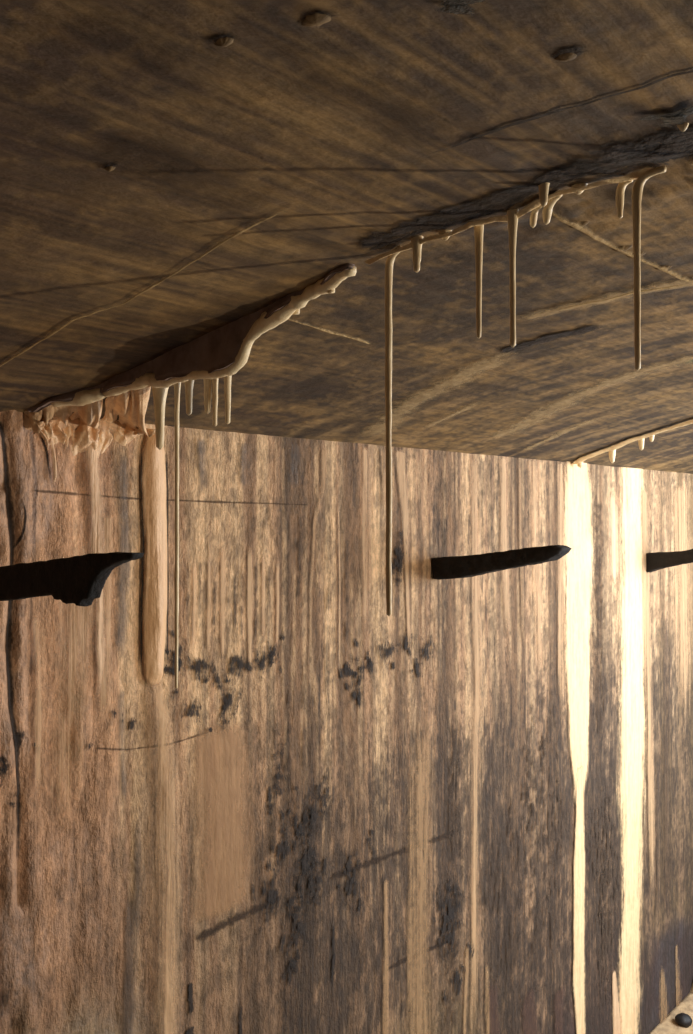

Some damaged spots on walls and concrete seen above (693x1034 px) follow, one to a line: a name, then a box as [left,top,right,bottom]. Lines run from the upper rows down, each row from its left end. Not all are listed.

crack [0,154,693,689]
water stain [327,451,435,707]
water stain [370,326,600,434]
spalling [361,108,693,249]
water stain [519,419,595,549]
crack [436,70,693,152]
water stain [495,357,693,437]
water stain [524,280,693,319]
crack [6,600,21,855]
water stain [155,456,285,1034]
water stain [252,727,376,985]
water stain [407,461,689,1034]